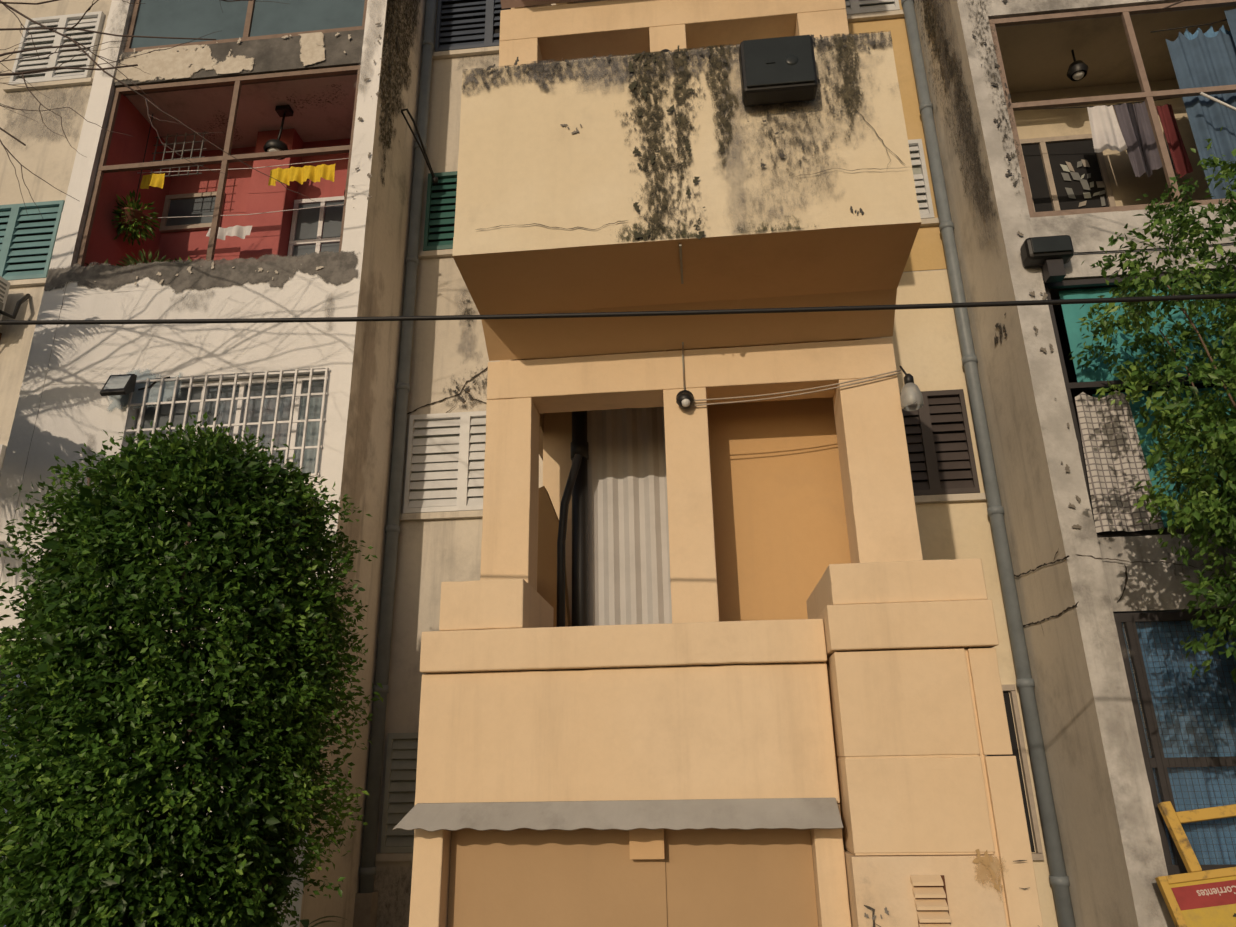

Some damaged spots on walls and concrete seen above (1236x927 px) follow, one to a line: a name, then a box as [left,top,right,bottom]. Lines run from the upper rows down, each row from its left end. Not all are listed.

peeling [114,38,254,82]
peeling [281,32,351,66]
damp [361,0,420,185]
damp [530,60,555,89]
damp [616,33,870,240]
damp [917,0,998,239]
crack [476,220,628,230]
crack [1014,551,1199,602]
crack [1023,602,1078,634]
crack [864,905,889,927]